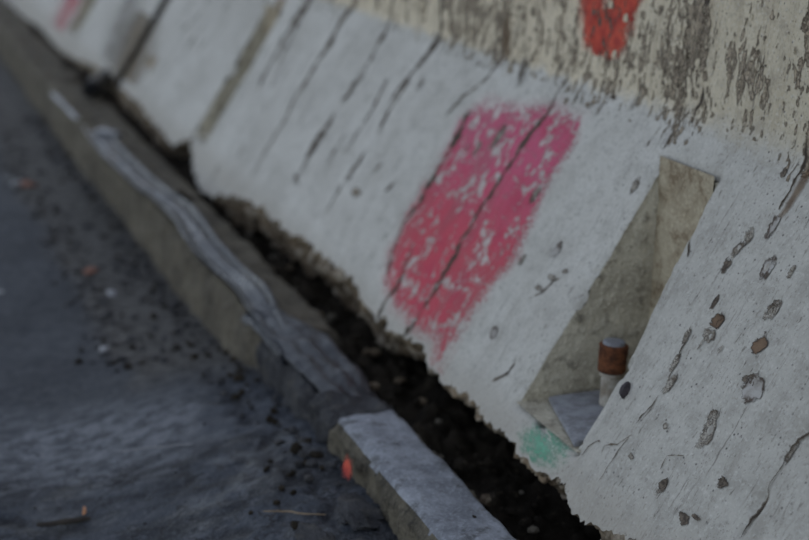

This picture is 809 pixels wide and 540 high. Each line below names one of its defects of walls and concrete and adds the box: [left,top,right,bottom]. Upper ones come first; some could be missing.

peeling [447,0,779,147]
spalling [783,1,809,115]
crack [377,57,501,321]
crack [404,61,564,337]
crack [778,142,808,210]
spalling [662,329,691,394]
spalling [697,294,725,353]
spalling [741,373,765,405]
hole [751,331,768,354]
spalling [695,409,719,448]
hole [679,511,700,526]
crack [741,432,809,537]